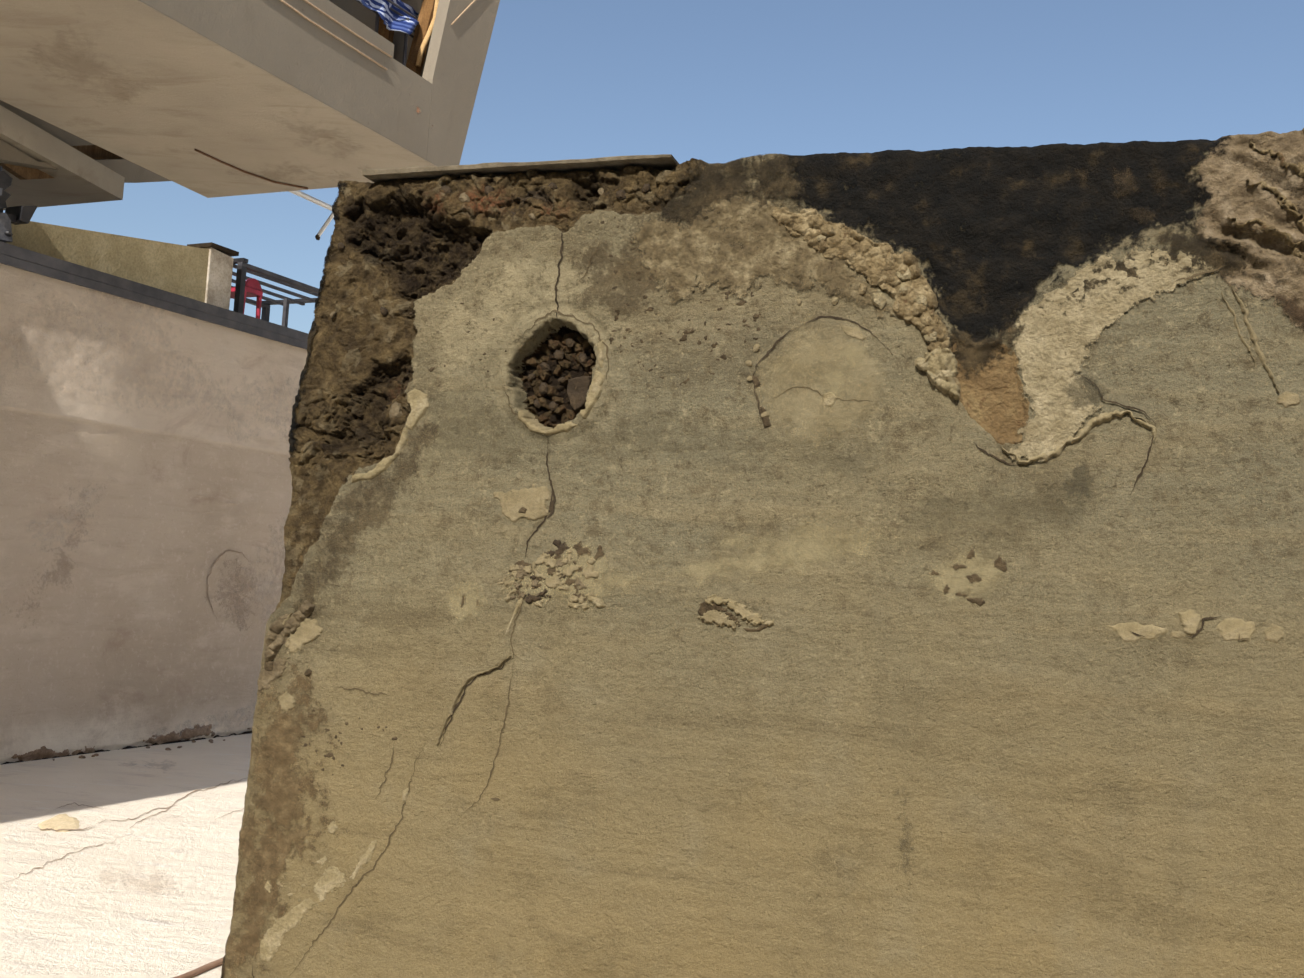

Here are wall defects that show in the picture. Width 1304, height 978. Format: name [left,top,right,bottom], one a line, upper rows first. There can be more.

crack [505,392,556,557]
spalling [257,128,1304,712]
crack [976,444,1018,465]
crack [1075,373,1156,495]
crack [2,778,245,884]
crack [290,597,524,975]